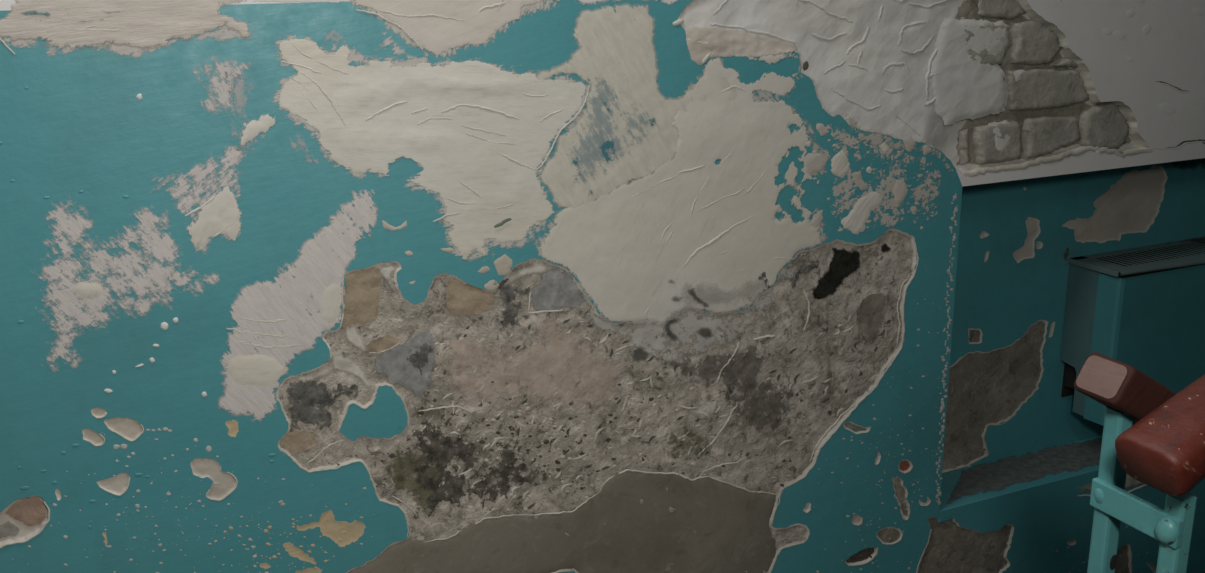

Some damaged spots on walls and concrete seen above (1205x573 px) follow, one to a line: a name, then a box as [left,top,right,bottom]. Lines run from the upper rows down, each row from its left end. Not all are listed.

spalling [673,0,1168,243]
crack [1152,139,1205,150]
peeling [276,228,919,573]
peeling [942,320,1055,473]
peeling [0,489,62,549]
peeling [845,459,1014,573]